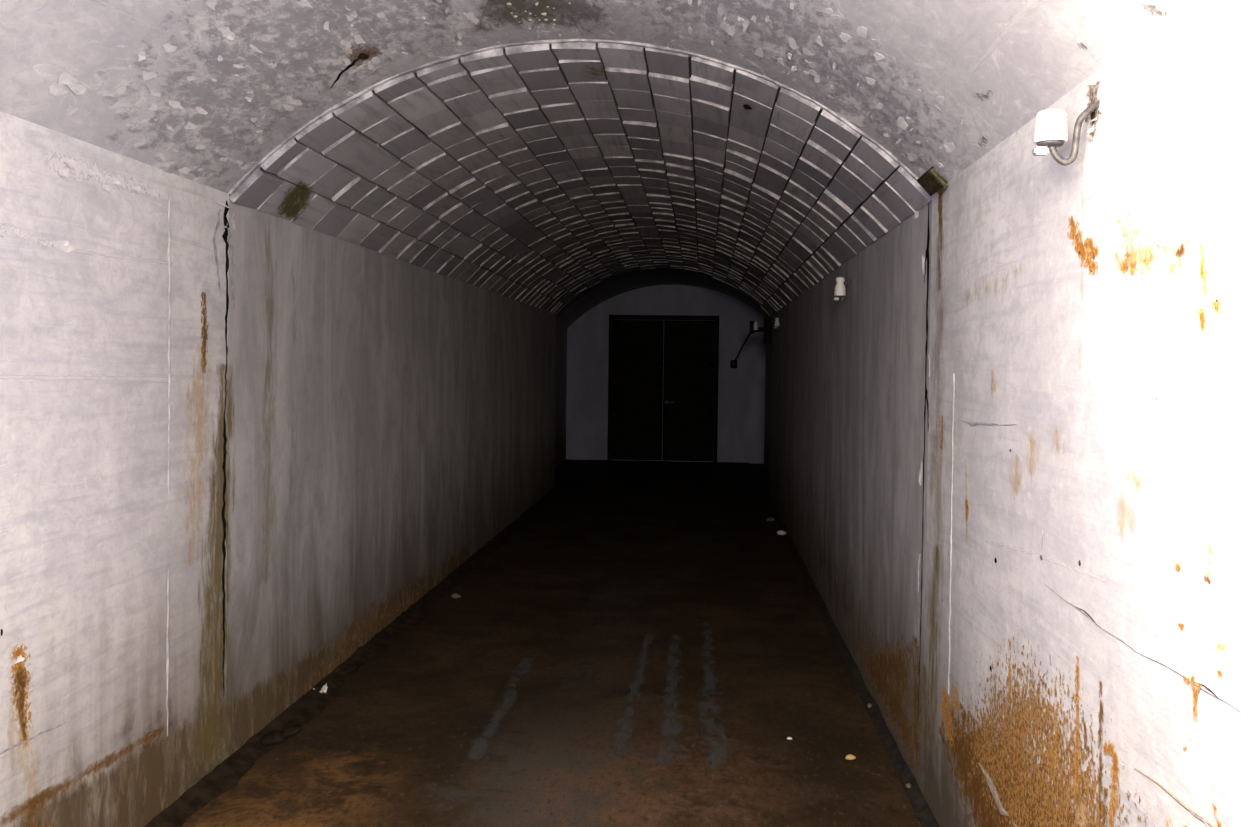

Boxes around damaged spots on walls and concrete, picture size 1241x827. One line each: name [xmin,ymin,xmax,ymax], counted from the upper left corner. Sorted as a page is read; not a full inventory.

peeling [101,45,208,131]
peeling [163,31,253,102]
peeling [250,5,408,111]
water stain [475,0,602,36]
peeling [688,0,773,53]
peeling [739,1,963,168]
rust [1067,216,1099,275]
rust [1114,212,1222,331]
rust [11,645,31,746]
water stain [2,545,470,827]
rust [921,637,1187,827]
crack [1046,584,1240,711]